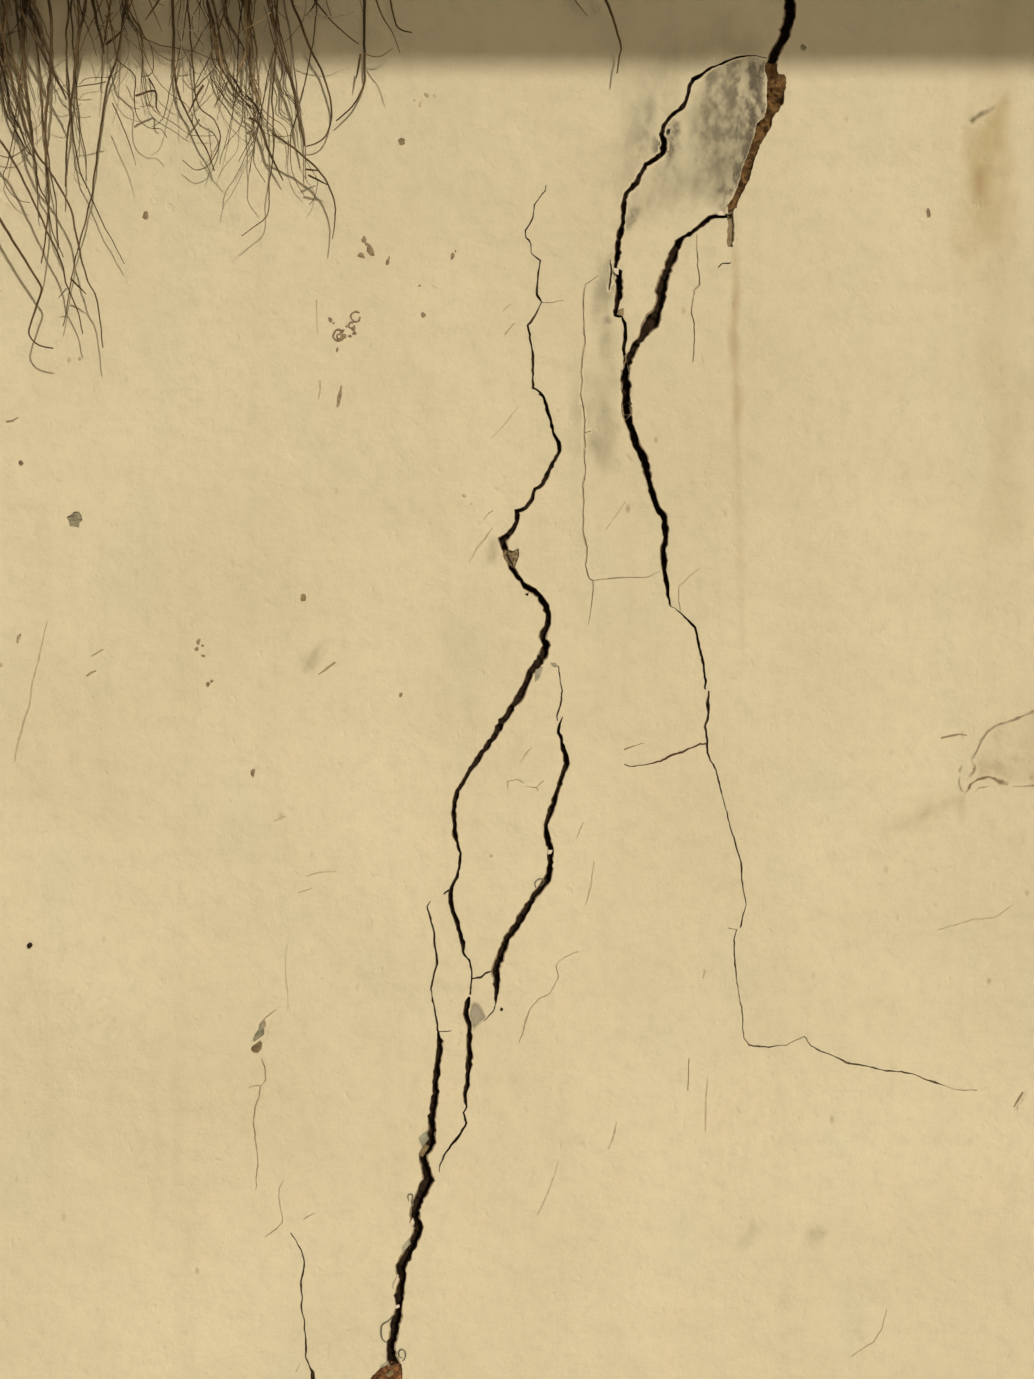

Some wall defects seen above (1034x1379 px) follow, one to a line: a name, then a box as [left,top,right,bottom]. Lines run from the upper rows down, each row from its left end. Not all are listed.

crack [370,0,977,1379]
crack [937,905,1012,930]
crack [249,1059,315,1379]